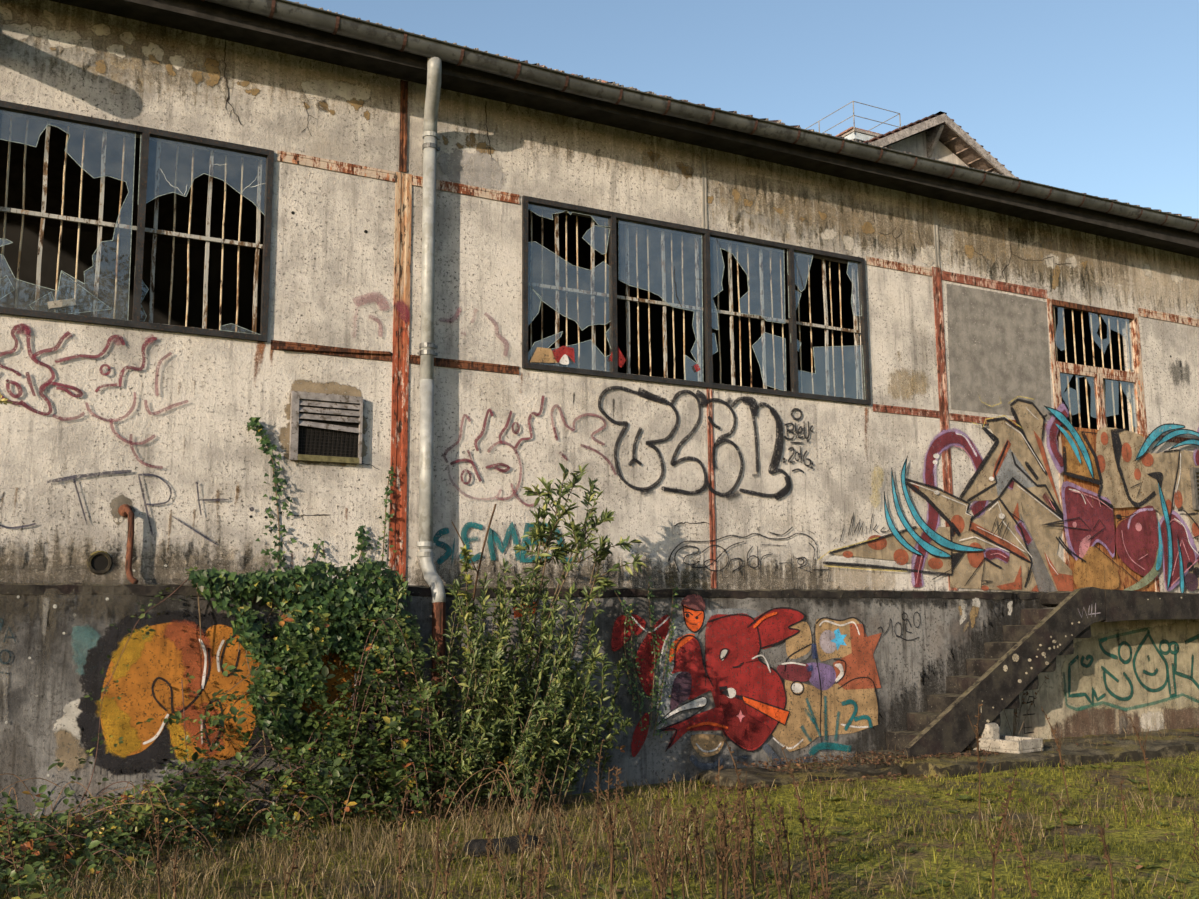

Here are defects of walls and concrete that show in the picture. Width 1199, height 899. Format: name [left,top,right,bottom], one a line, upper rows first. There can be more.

spalling [279,380,367,466]
water stain [0,540,270,686]
water stain [412,558,1049,757]